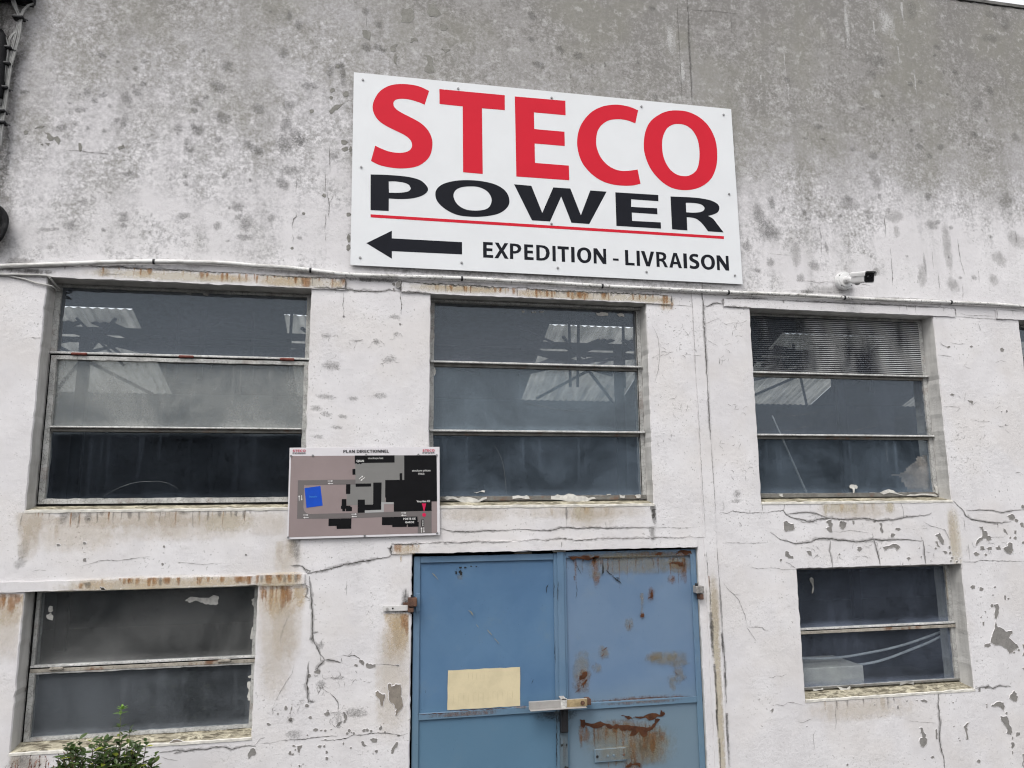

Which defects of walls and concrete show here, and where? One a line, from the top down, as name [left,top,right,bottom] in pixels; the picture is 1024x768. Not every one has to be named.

crack [678,0,739,93]
crack [82,219,1024,761]
peeling [783,520,795,532]
peeling [825,519,855,533]
peeling [873,504,1024,563]
corrosion [236,575,291,604]
corrosion [568,555,621,583]
corrosion [648,550,692,580]
peeling [970,585,1024,670]
peeling [375,683,404,716]
corrosion [580,696,687,768]
peeling [978,686,1024,768]